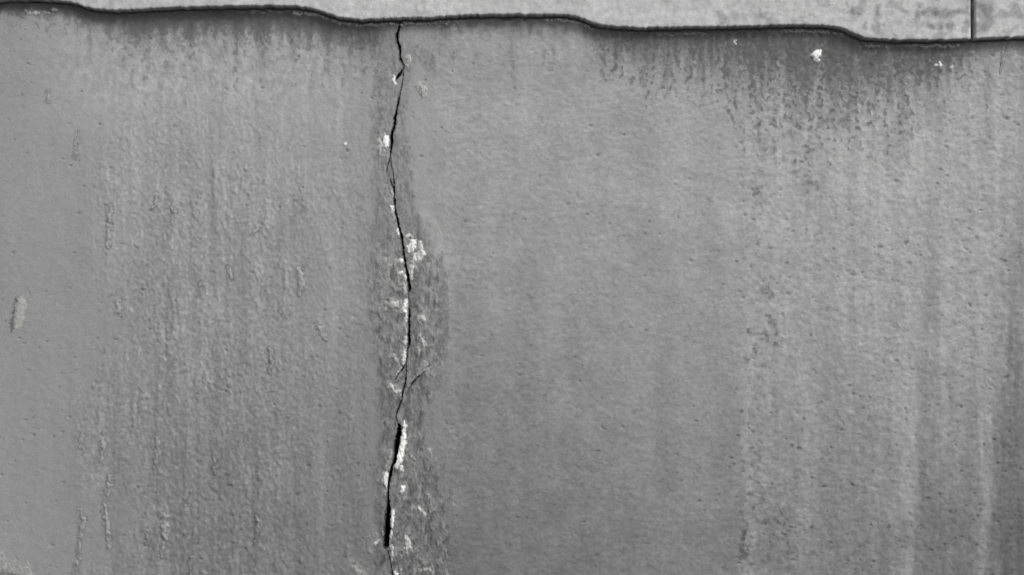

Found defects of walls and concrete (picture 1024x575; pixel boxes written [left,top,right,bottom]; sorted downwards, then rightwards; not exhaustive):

crack [346,21,443,575]
water stain [432,18,992,176]